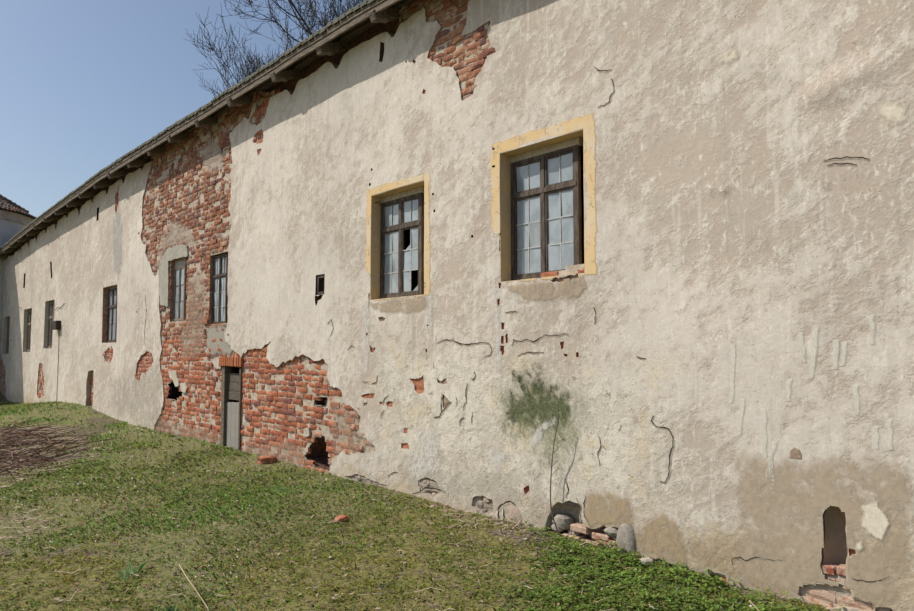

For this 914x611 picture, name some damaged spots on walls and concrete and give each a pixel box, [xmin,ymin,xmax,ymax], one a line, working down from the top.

flaking render [398,0,496,101]
crack [593,66,615,109]
crack [823,156,869,167]
flaking render [135,88,393,473]
crack [434,333,569,426]
spalling [344,474,388,488]
crack [650,416,675,485]
flaking render [797,501,893,611]